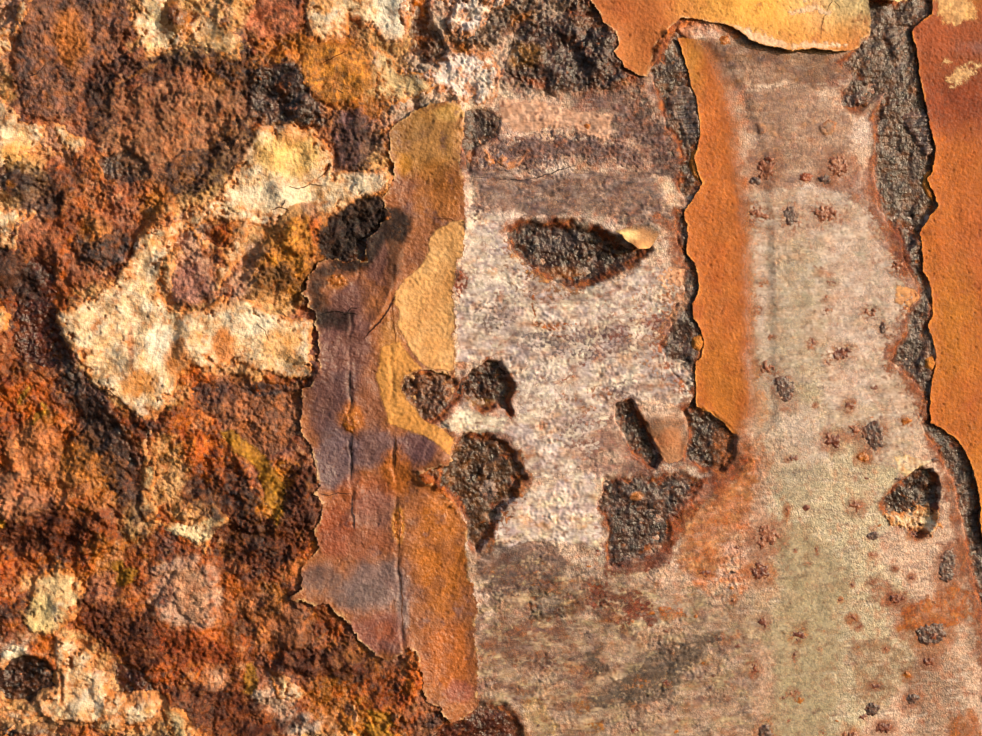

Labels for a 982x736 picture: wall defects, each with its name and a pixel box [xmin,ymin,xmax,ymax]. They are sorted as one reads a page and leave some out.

corrosion [82,45,255,142]
corrosion [156,120,253,196]
spalling [505,216,659,289]
corrosion [701,35,928,426]
peeling [590,0,982,623]
peeling [55,0,528,736]
corrosion [79,396,151,535]
corrosion [183,462,320,569]
corrosion [821,399,891,464]
corrosion [887,442,982,670]
corrosion [78,596,237,676]
corrosion [835,682,895,736]